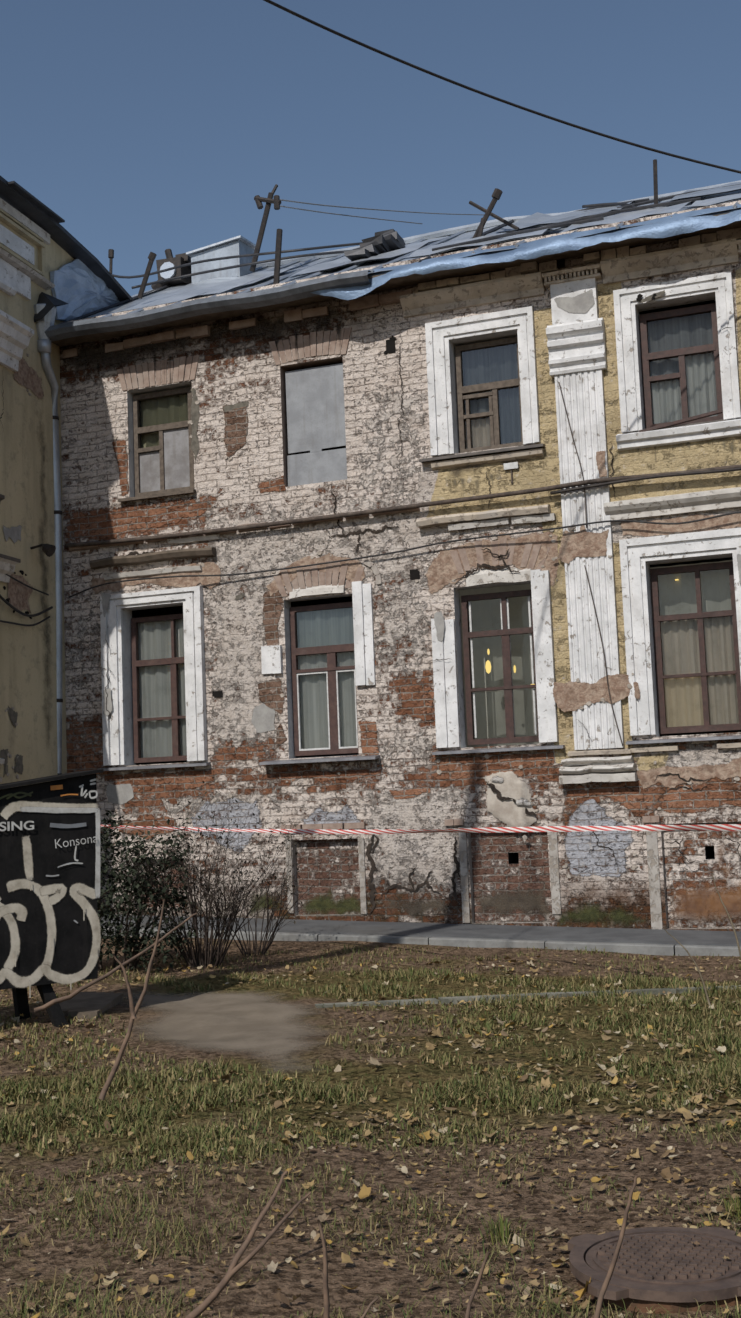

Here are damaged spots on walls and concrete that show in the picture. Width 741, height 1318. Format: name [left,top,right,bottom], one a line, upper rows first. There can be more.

spalling [188,388,200,458]
spalling [221,401,248,461]
flaking render [112,436,129,496]
spalling [410,507,741,594]
spalling [89,561,221,617]
spalling [257,551,365,646]
peeling [434,612,445,641]
flaking render [400,685,434,723]
spalling [549,673,640,712]
flaking render [273,720,383,784]
peeling [389,752,552,840]
crack [366,834,461,914]